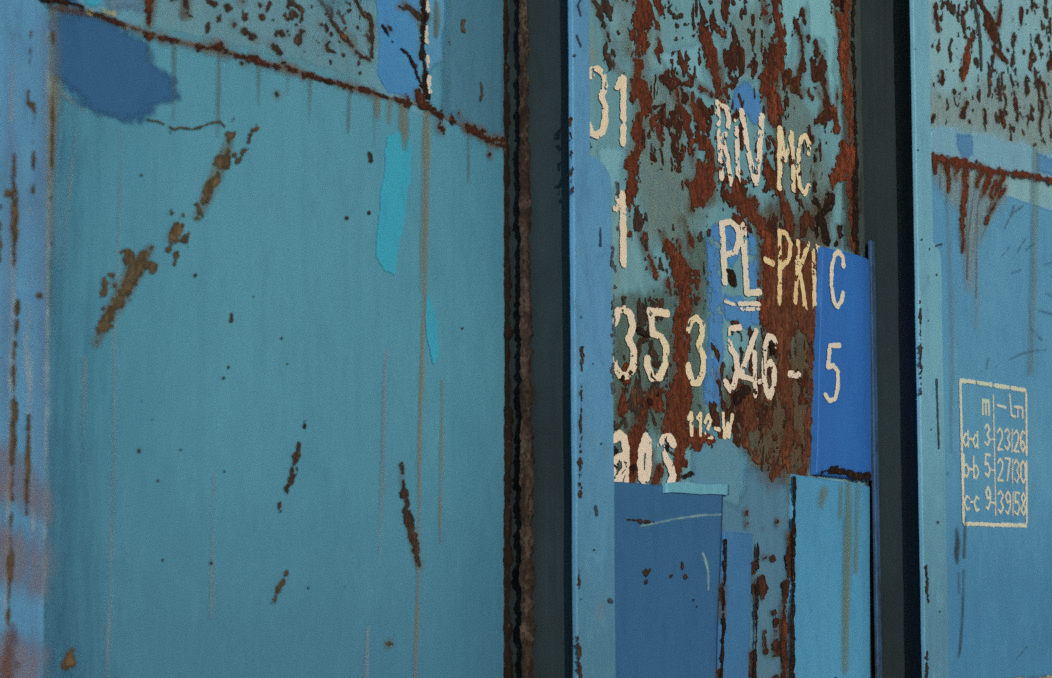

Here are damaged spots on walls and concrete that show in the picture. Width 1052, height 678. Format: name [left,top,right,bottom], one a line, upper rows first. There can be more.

rust [961,37,971,91]
rust [977,0,1010,64]
rust [49,0,507,271]
rust [603,0,872,485]
rust [931,151,1052,293]
rust [575,636,583,678]
rust [749,531,793,678]